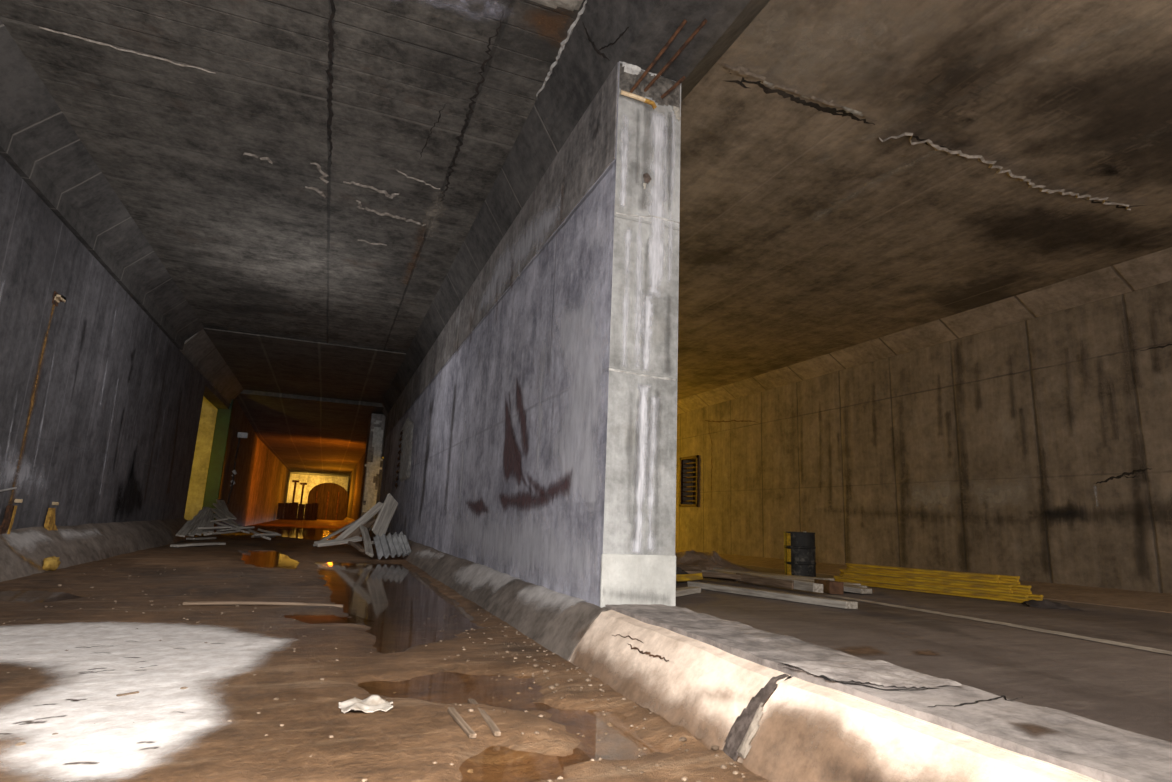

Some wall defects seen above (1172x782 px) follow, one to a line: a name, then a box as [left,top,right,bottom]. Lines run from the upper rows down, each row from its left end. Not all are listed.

spalling [531,0,583,11]
crack [39,27,216,74]
crack [536,0,629,97]
crack [243,153,273,164]
crack [305,0,505,246]
crack [726,71,1147,210]
rust [10,304,55,505]
crack [616,634,669,661]
crack [927,695,1023,707]